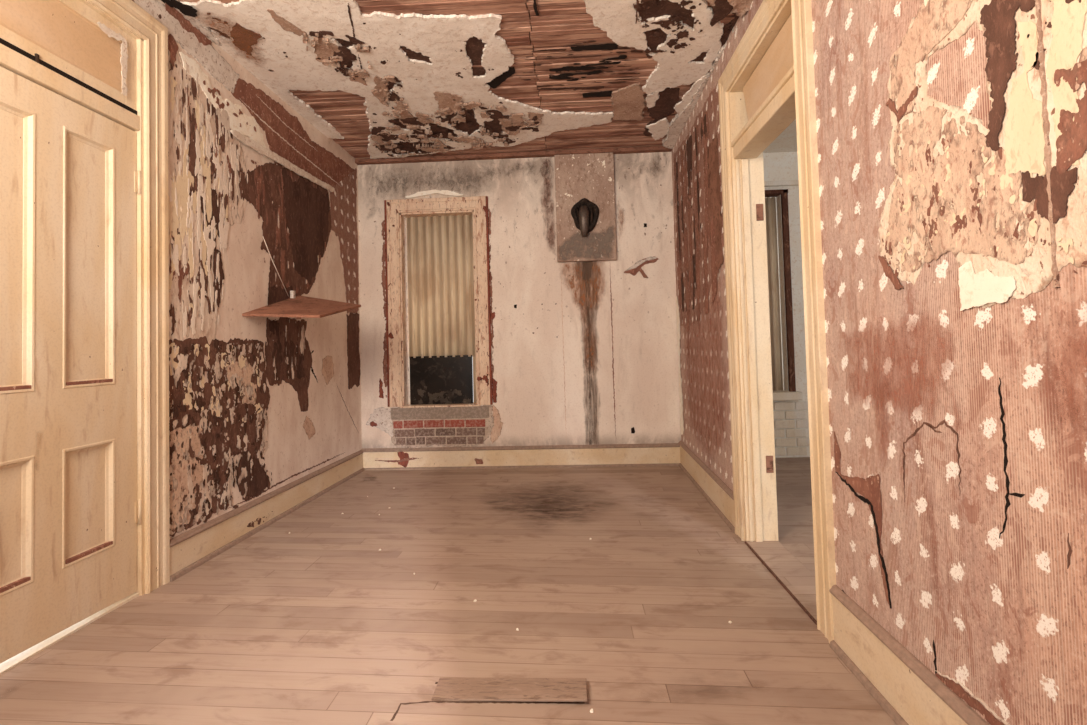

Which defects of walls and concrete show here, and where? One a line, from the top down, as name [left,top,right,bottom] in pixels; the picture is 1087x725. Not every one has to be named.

peeling [94,19,128,96]
peeling [132,0,753,192]
peeling [980,0,1035,151]
peeling [405,190,464,199]
peeling [1021,166,1077,223]
flaking render [366,206,504,467]
peeling [169,343,267,533]
spalling [303,416,315,439]
crack [902,420,961,501]
crack [998,377,1025,539]
crack [1065,533,1073,569]